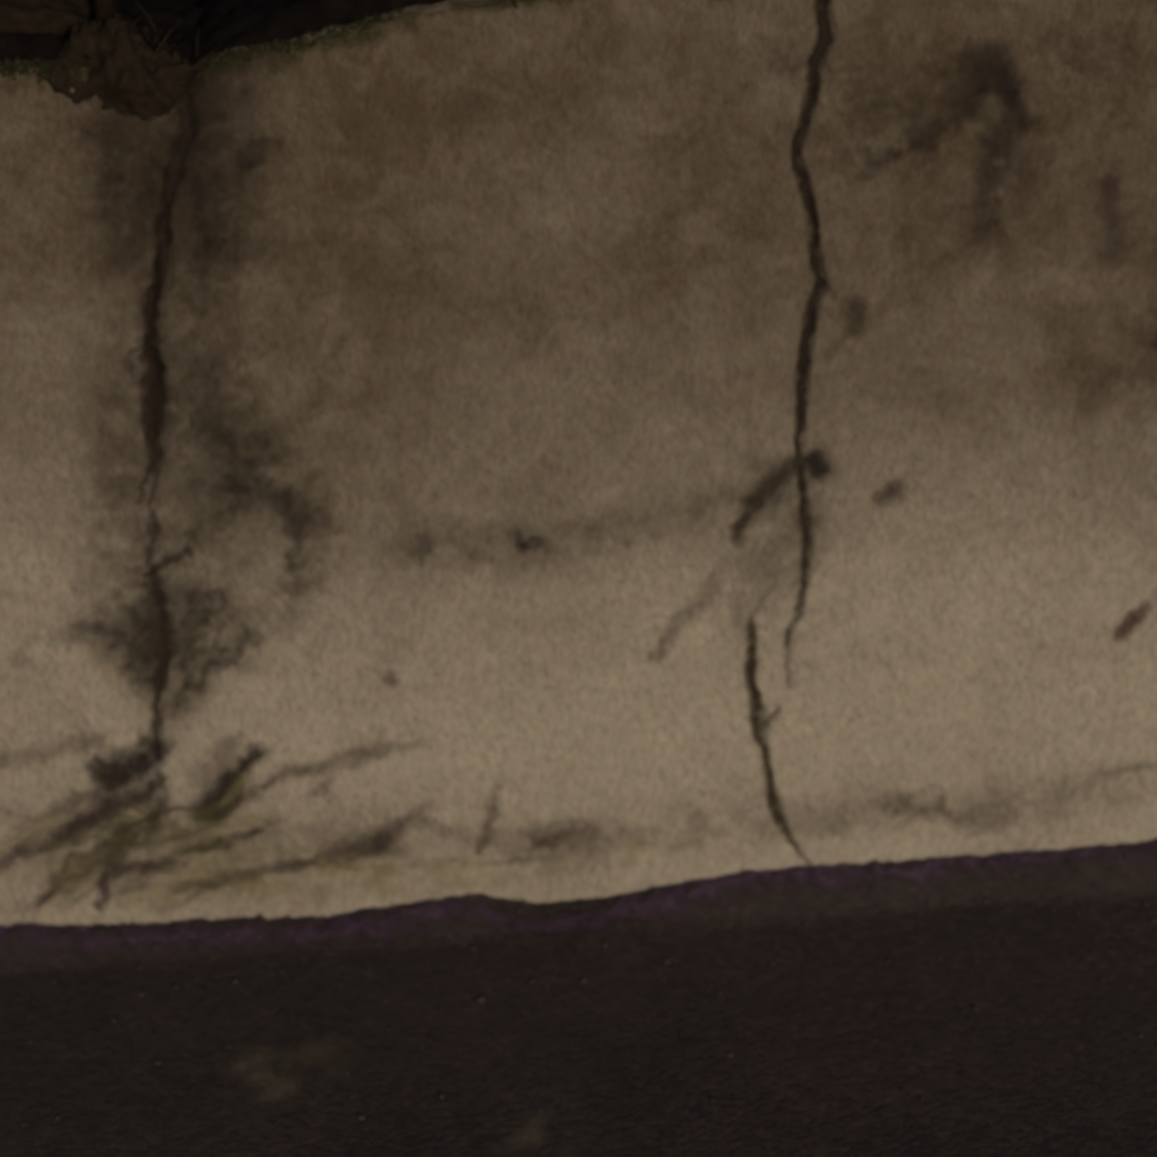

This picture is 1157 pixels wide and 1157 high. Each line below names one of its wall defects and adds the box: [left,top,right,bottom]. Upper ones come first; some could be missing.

crack [140,94,198,481]
crack [792,0,832,615]
crack [146,523,179,760]
crack [745,622,800,854]